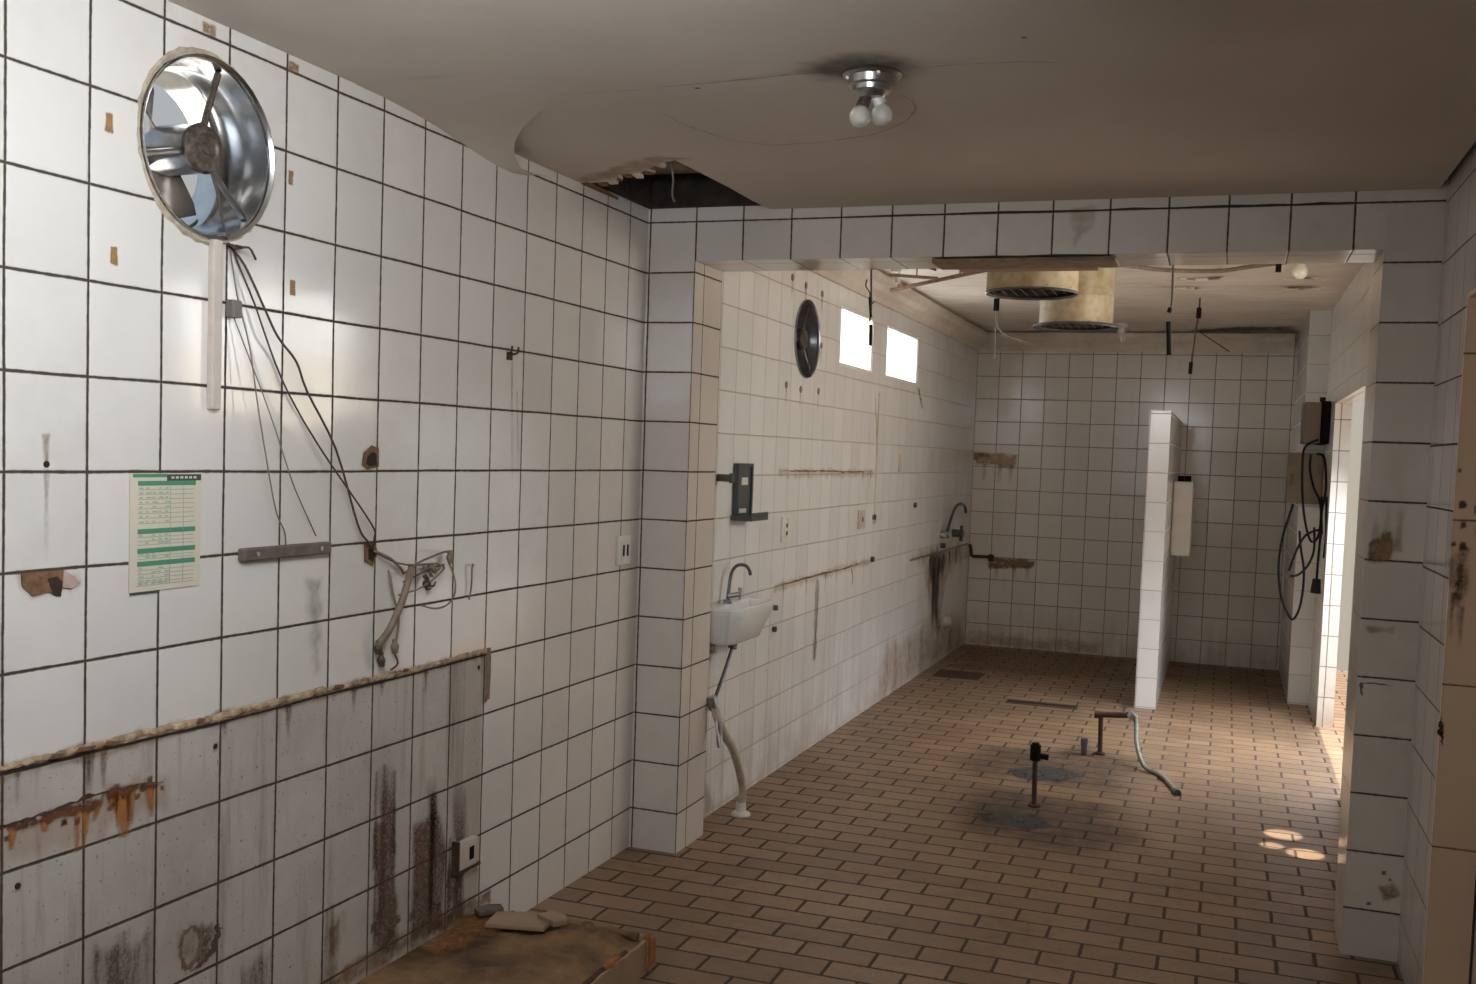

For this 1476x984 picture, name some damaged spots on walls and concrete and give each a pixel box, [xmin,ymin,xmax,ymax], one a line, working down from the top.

peeling [581,163,666,200]
spalling [21,570,80,597]
leakage [930,551,956,619]
corrosion [0,776,164,849]
leakage [373,766,395,924]
leakage [428,796,464,928]
leakage [178,924,223,972]